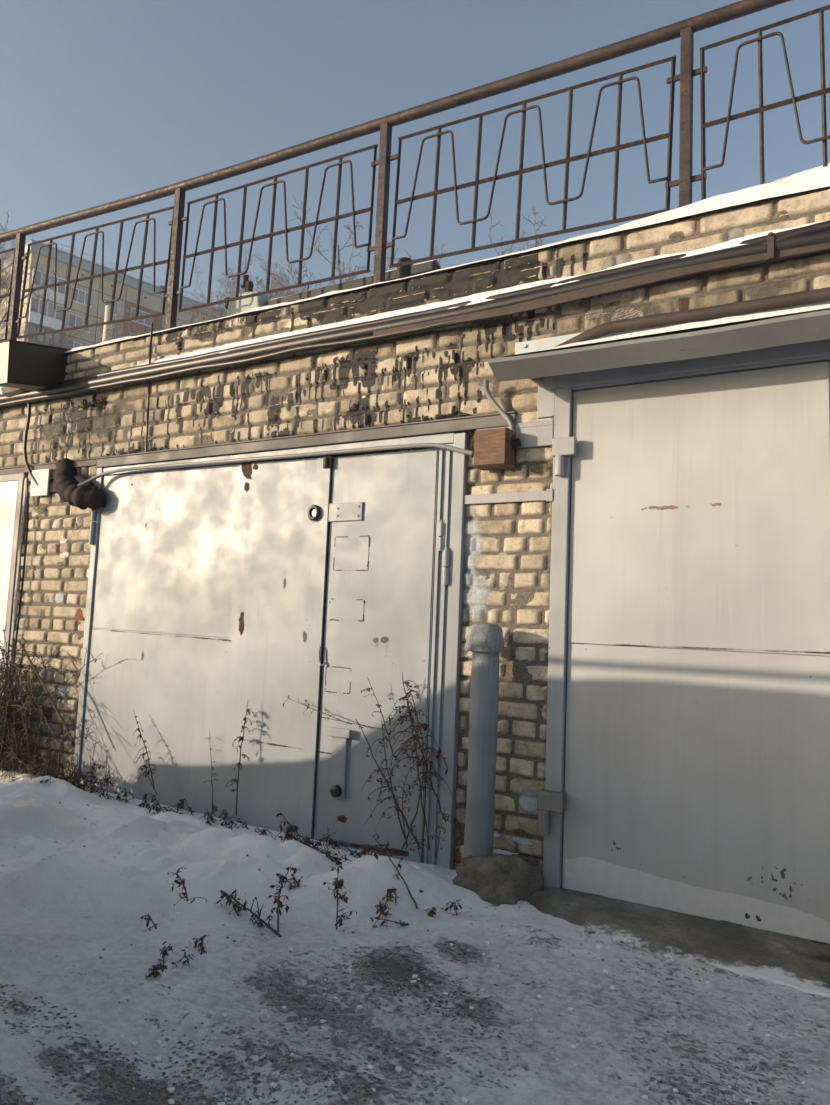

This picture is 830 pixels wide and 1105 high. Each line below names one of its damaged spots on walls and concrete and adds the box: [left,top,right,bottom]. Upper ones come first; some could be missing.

water stain [166,252,588,355]
rust [678,297,689,311]
water stain [38,310,555,463]
rust [241,463,258,492]